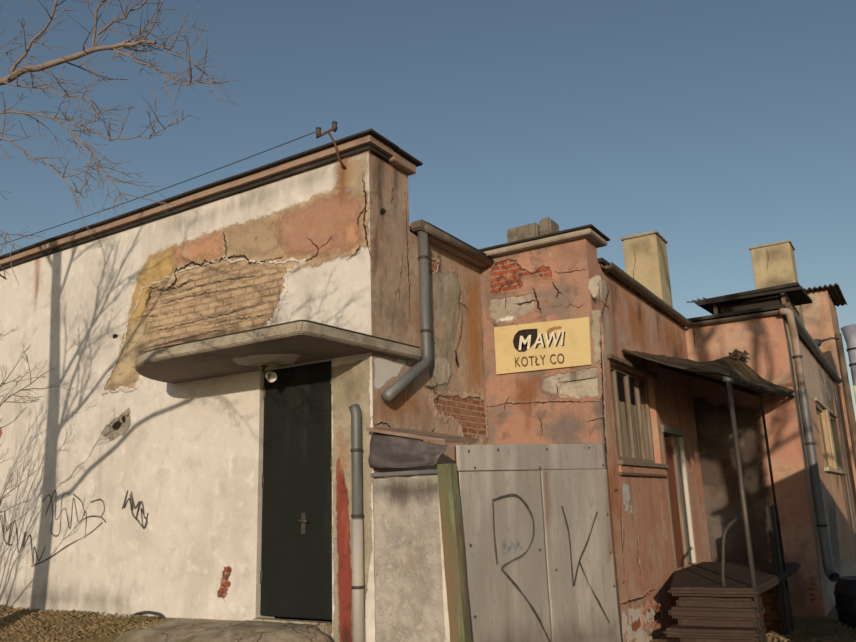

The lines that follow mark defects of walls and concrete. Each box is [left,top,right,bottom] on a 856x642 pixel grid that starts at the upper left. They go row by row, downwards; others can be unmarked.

crack [144,231,283,307]
flaking render [102,157,386,396]
crack [345,174,372,260]
crack [390,183,412,325]
spalling [485,255,558,327]
crack [482,268,609,451]
flaking render [102,408,130,440]
spalling [429,389,488,445]
spalling [216,562,234,602]
peeling [621,596,663,642]